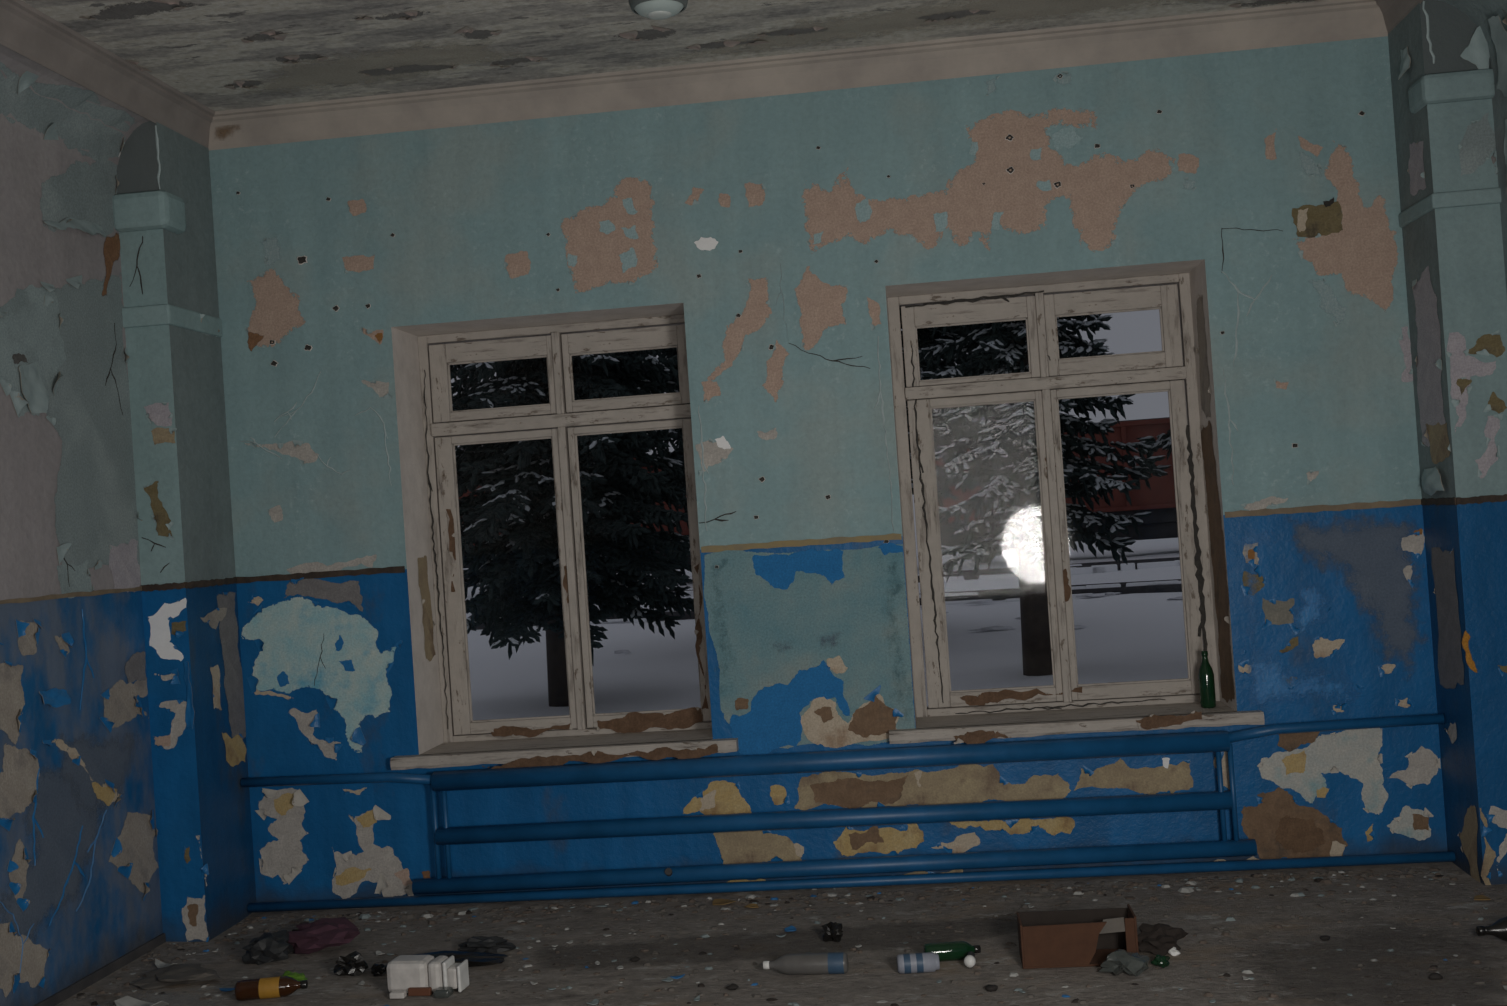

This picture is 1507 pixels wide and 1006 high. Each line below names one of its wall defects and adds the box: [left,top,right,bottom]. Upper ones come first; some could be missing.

peeling [762,108,1199,402]
peeling [1292,136,1399,311]
peeling [0,273,177,598]
peeling [0,618,158,998]
peeling [99,554,402,760]
peeling [255,788,309,884]
peeling [332,805,414,899]
spalling [683,780,804,882]
spalling [801,685,904,748]
spalling [833,817,1075,875]
spalling [770,758,1193,810]
spalling [1196,295,1464,860]